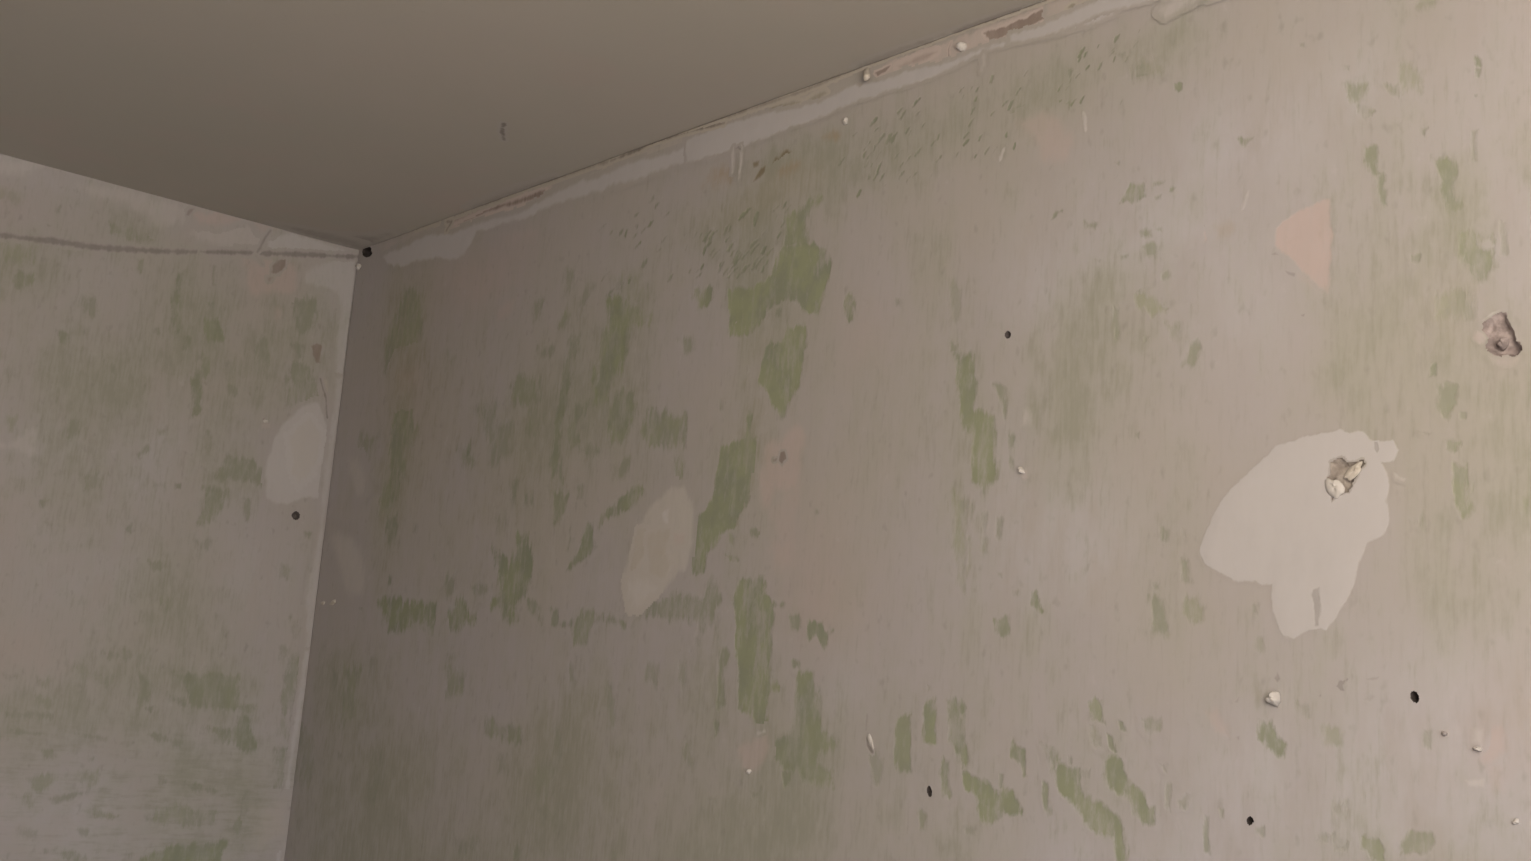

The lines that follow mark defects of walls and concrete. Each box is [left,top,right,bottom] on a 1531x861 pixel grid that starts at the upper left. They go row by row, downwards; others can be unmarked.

spalling [1471,309,1525,371]
peeling [1325,461,1363,499]